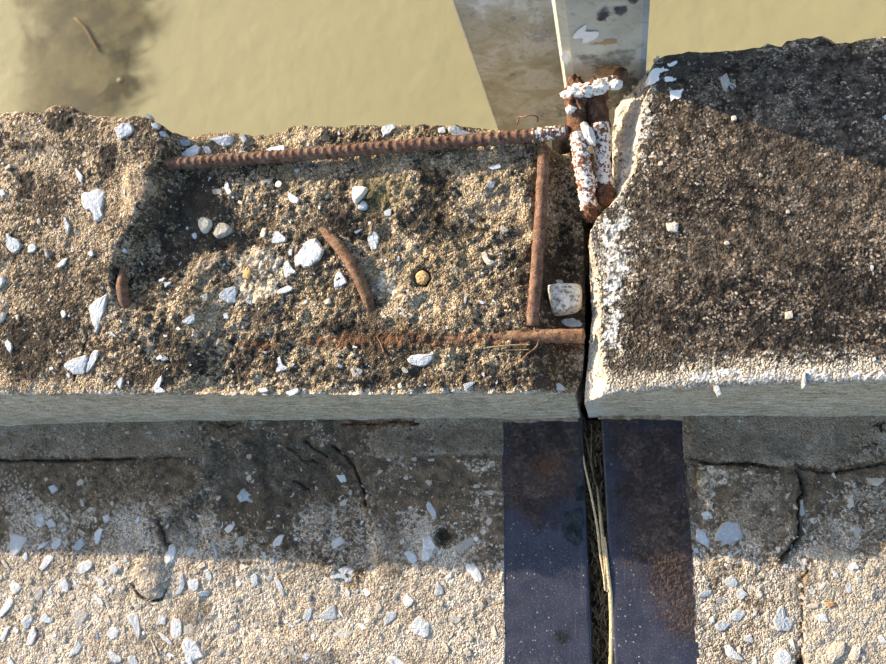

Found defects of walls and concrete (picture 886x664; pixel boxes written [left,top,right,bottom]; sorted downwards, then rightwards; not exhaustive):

corrosion [596,66,622,78]
spalling [101,105,606,397]
damp [597,37,886,386]
corrosion [303,330,586,352]
crack [0,455,136,463]
crack [694,459,886,556]